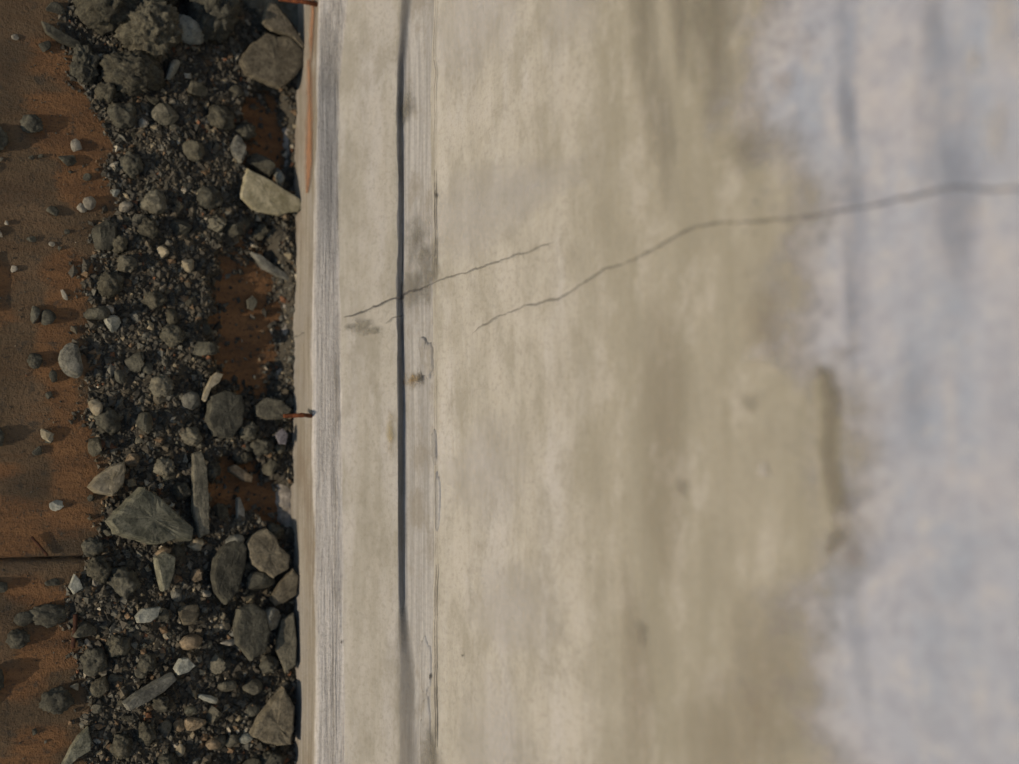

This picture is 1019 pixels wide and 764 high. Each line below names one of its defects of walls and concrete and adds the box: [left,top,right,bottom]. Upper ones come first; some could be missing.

crack [345,170,436,317]
crack [800,185,1019,218]